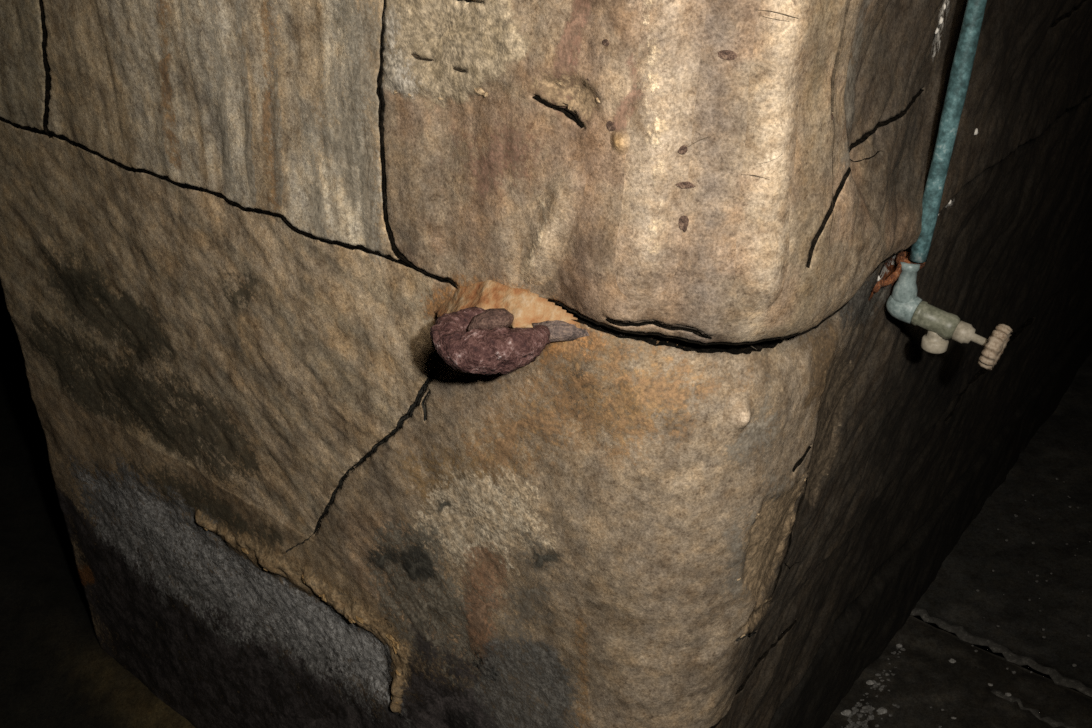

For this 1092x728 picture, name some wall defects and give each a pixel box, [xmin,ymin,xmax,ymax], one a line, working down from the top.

crack [0,0,466,289]
crack [533,95,585,128]
crack [806,0,924,268]
leakage [931,0,949,57]
crack [282,365,438,554]
rust [398,312,705,513]
crack [548,299,850,355]
rust [869,248,909,300]
peeling [194,507,411,713]